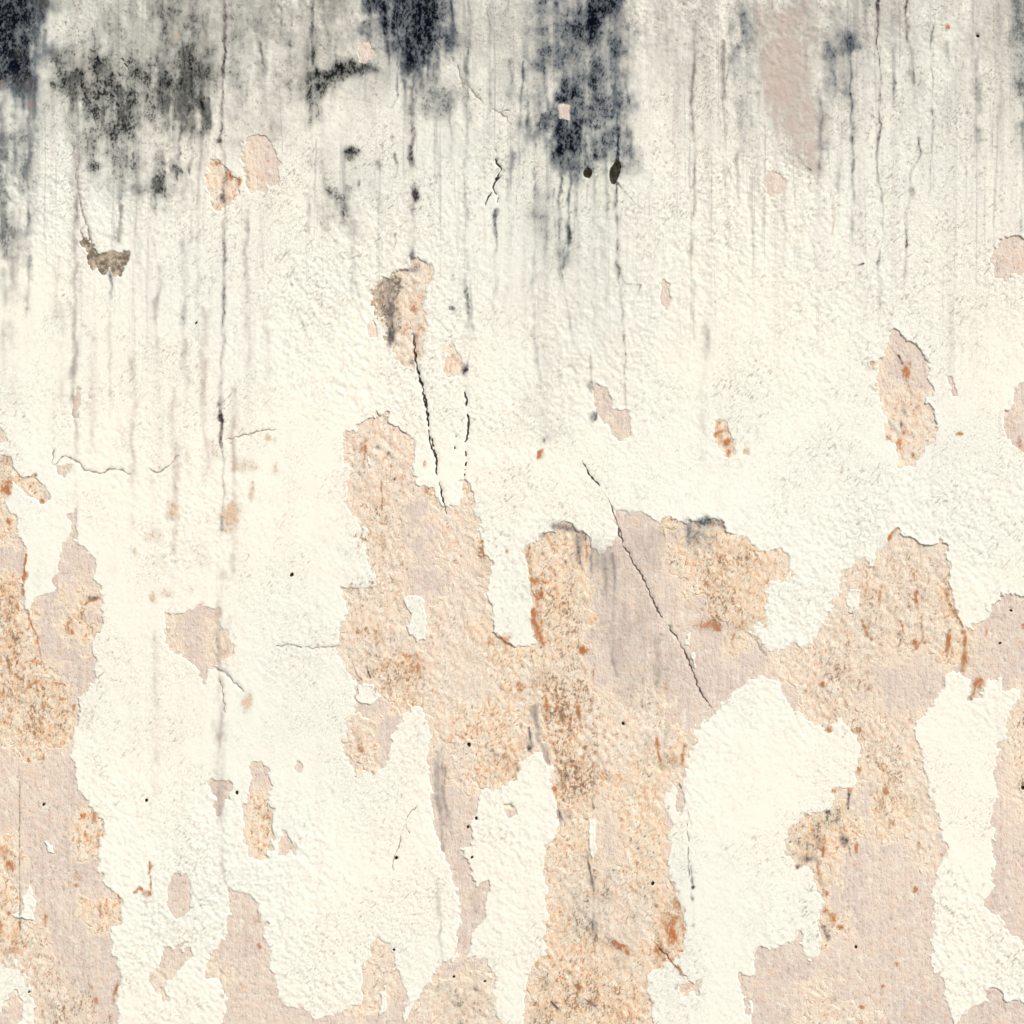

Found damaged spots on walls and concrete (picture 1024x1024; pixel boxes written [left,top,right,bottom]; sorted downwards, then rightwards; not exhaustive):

damp [0,0,245,256]
damp [306,2,378,123]
damp [361,0,471,165]
damp [509,0,638,276]
spalling [74,237,130,278]
damp [218,403,236,461]
peeling [367,254,434,369]
crack [410,322,470,514]
peeling [870,320,941,469]
crack [581,459,715,711]
peeling [0,428,123,1024]
peeling [204,406,1024,1024]